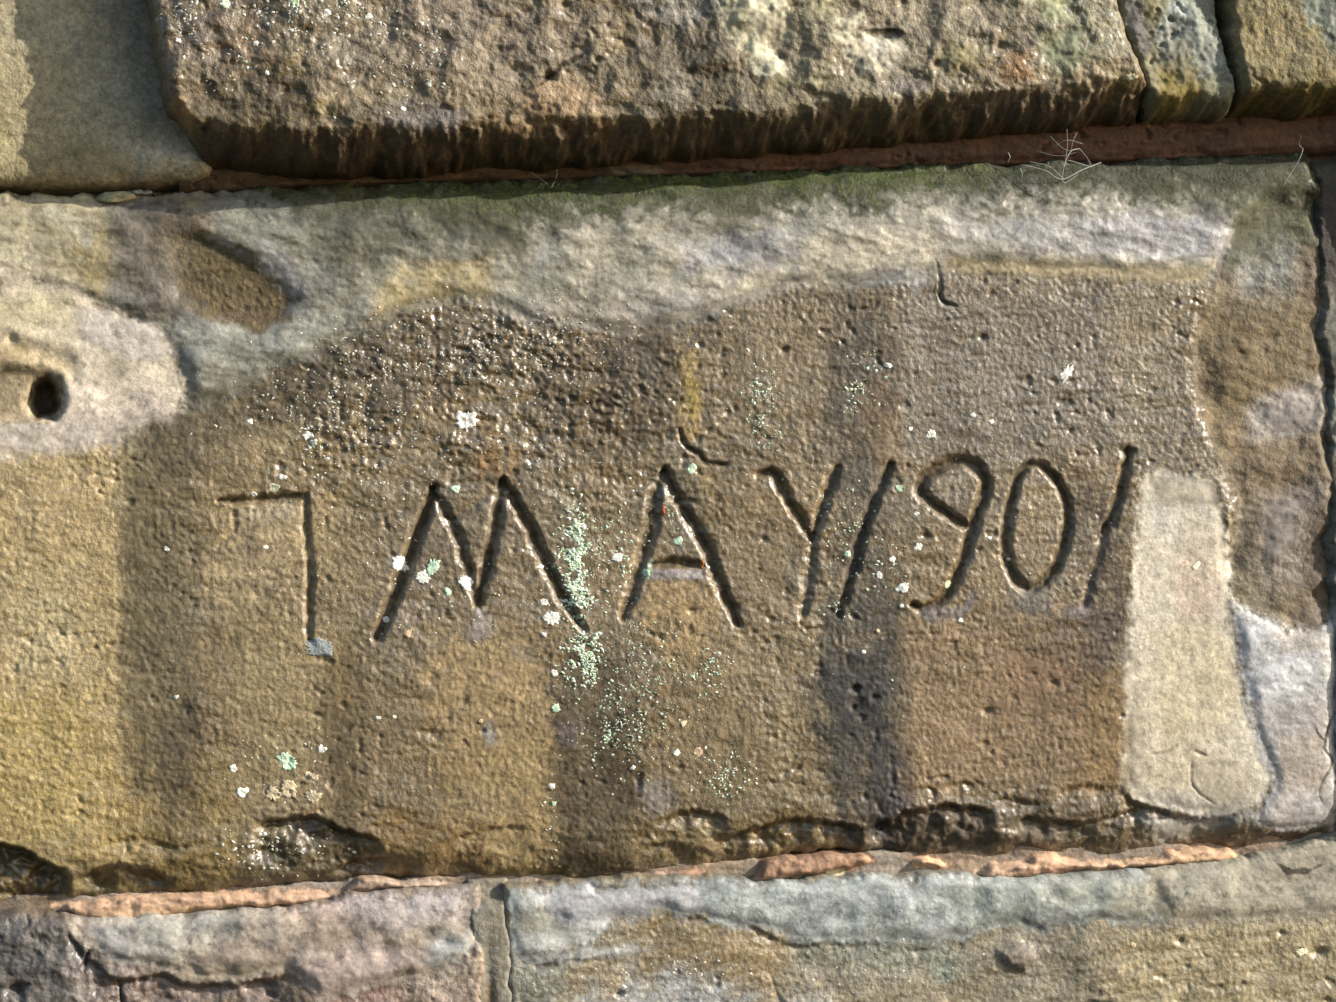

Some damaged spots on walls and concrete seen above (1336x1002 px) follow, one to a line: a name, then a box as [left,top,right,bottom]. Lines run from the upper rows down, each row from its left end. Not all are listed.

leakage [817,299,911,844]